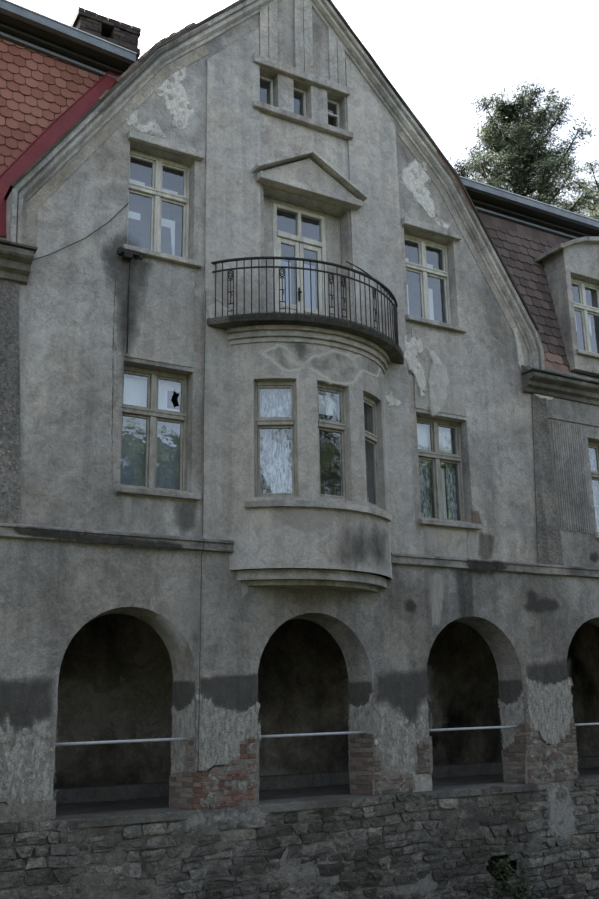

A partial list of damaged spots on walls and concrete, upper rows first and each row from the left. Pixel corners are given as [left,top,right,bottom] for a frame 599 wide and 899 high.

flaking render [124,67,195,138]
flaking render [401,158,450,229]
flaking render [404,334,426,397]
damp [0,682,51,739]
flaking render [0,668,262,823]
damp [172,675,257,712]
damp [348,670,429,726]
flaking render [342,672,444,796]
damp [499,662,569,705]
flaking render [498,677,580,784]